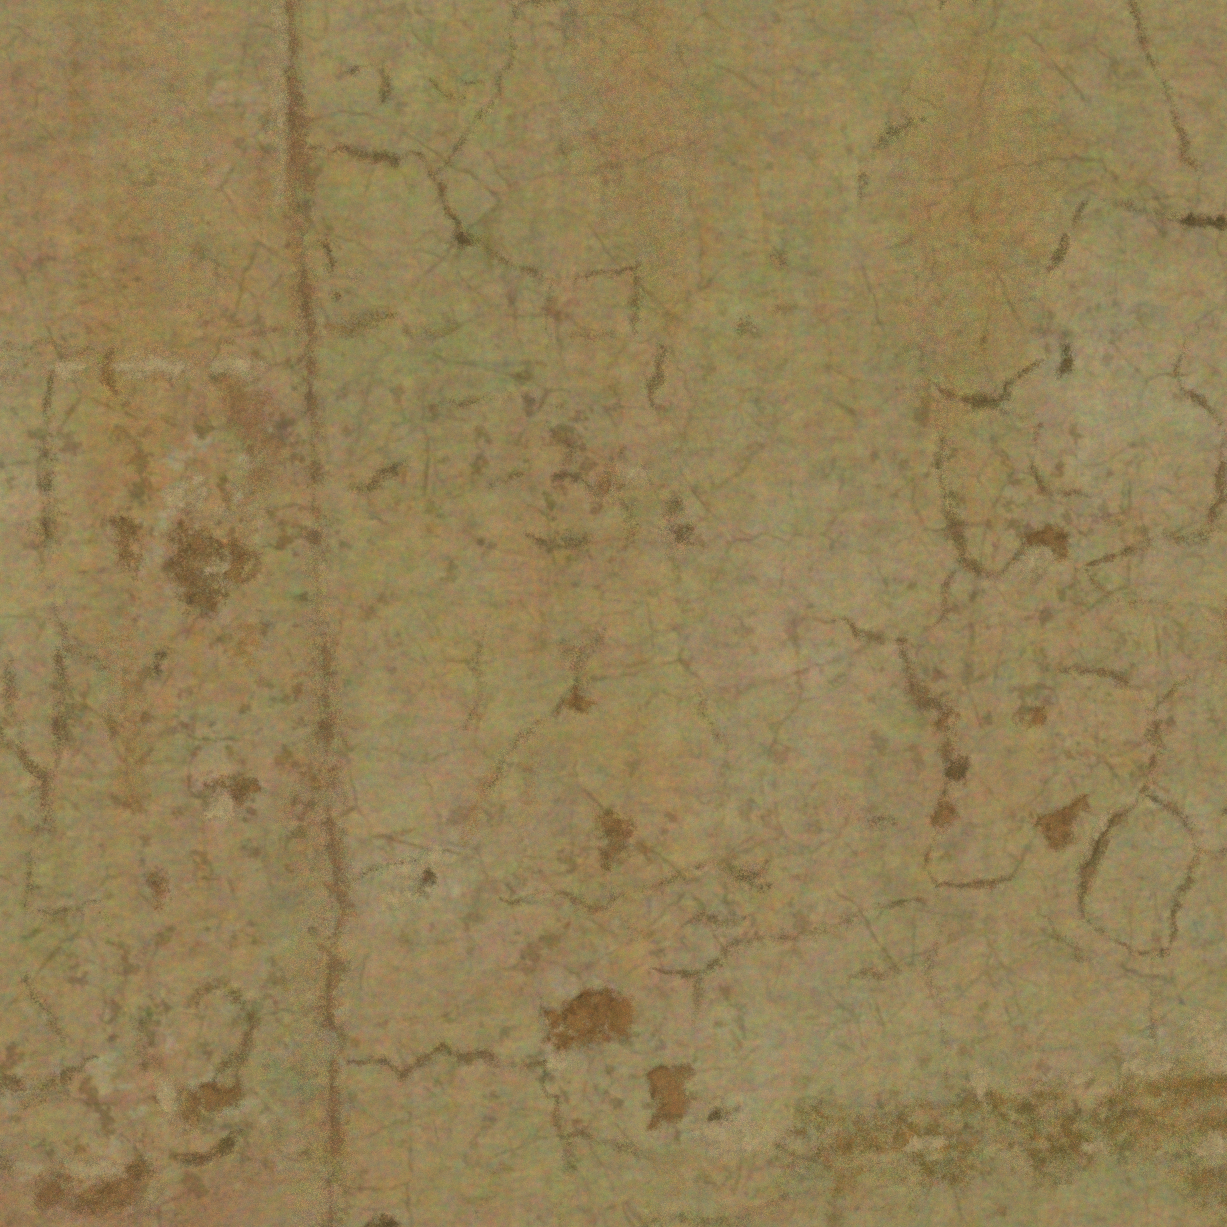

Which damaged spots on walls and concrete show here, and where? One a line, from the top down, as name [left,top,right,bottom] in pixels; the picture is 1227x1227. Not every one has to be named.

spalling [105,508,146,582]
spalling [160,469,258,624]
crack [222,0,670,1227]
crack [831,327,1227,802]
spalling [590,804,638,870]
spalling [1025,794,1109,862]
crack [1042,662,1227,1046]
crack [0,974,164,1110]
spalling [538,978,639,1077]
spalling [644,1061,781,1161]
crack [497,835,1016,1076]
leakage [778,1051,1227,1213]